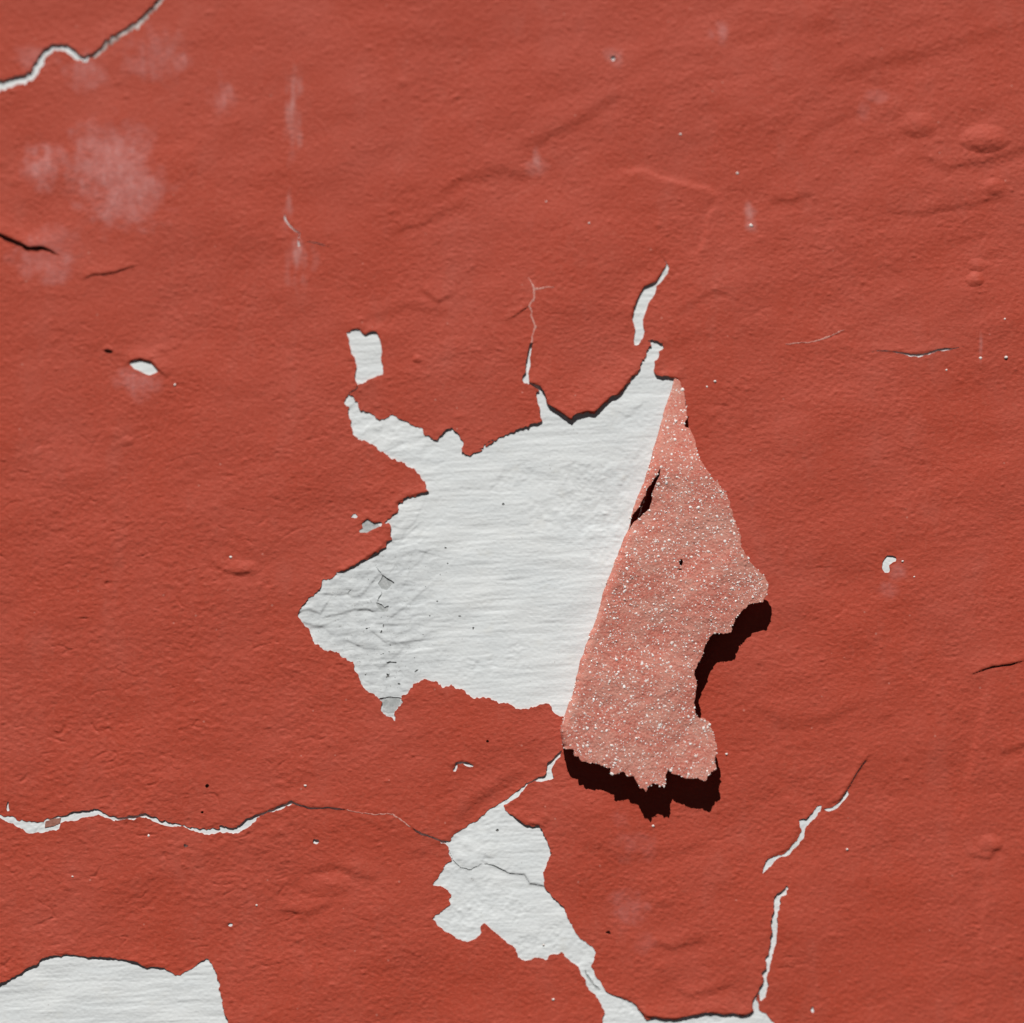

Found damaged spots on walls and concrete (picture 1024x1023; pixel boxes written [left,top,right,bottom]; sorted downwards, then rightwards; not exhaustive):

crack [0,0,163,90]
crack [0,233,57,254]
peeling [129,360,158,375]
peeling [882,555,896,573]
peeling [298,255,774,1023]
crack [0,800,442,841]
crack [755,760,866,1000]
peeling [0,954,228,1023]